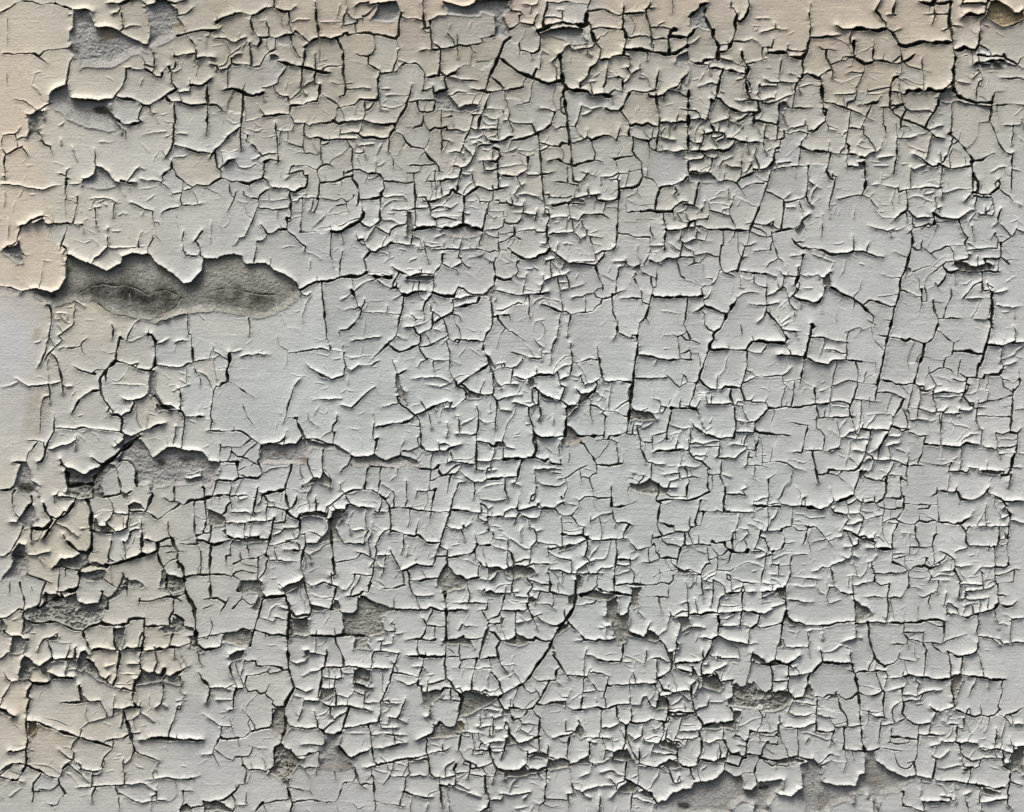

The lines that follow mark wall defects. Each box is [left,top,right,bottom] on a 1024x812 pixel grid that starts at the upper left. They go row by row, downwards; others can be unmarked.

crack [0,0,74,112]
peeling [67,0,185,69]
peeling [27,84,122,139]
crack [1,127,85,256]
crack [792,239,883,261]
peeling [32,249,300,324]
crack [11,283,188,431]
crack [13,417,91,468]
peeling [65,434,220,499]
peeling [0,580,145,683]
crack [147,633,190,696]
peeling [658,667,813,734]